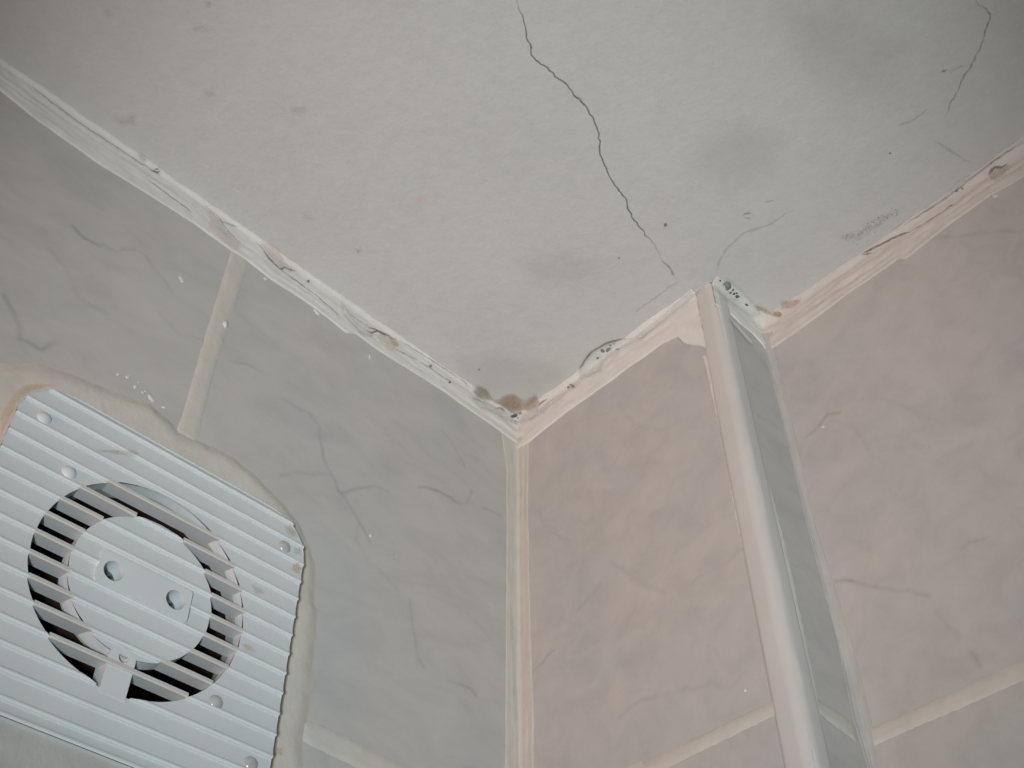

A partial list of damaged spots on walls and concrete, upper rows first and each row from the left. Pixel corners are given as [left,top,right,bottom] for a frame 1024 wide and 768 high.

crack [522,15,647,237]
spalling [574,287,701,386]
spalling [714,280,759,316]